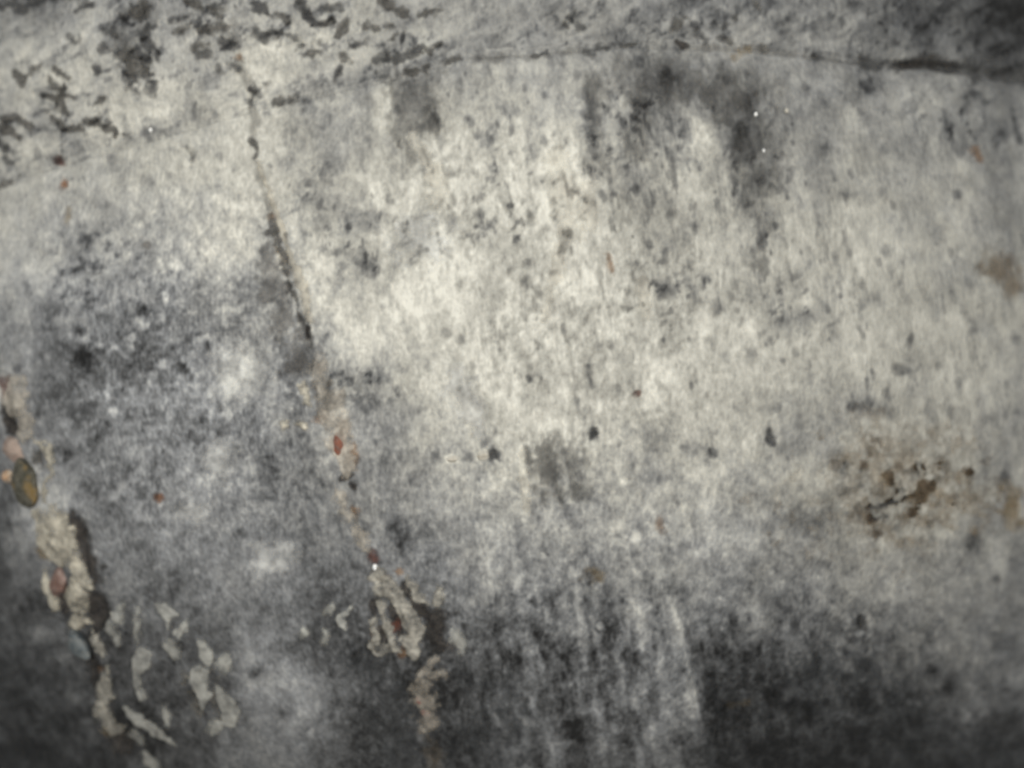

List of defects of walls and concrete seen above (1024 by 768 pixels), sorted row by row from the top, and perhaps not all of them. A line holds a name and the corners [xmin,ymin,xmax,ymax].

crack [582,43,636,54]
crack [675,39,689,49]
crack [859,53,1019,83]
crack [248,139,312,340]
spalling [258,231,467,732]
spalling [0,375,188,768]
peeling [181,640,241,736]